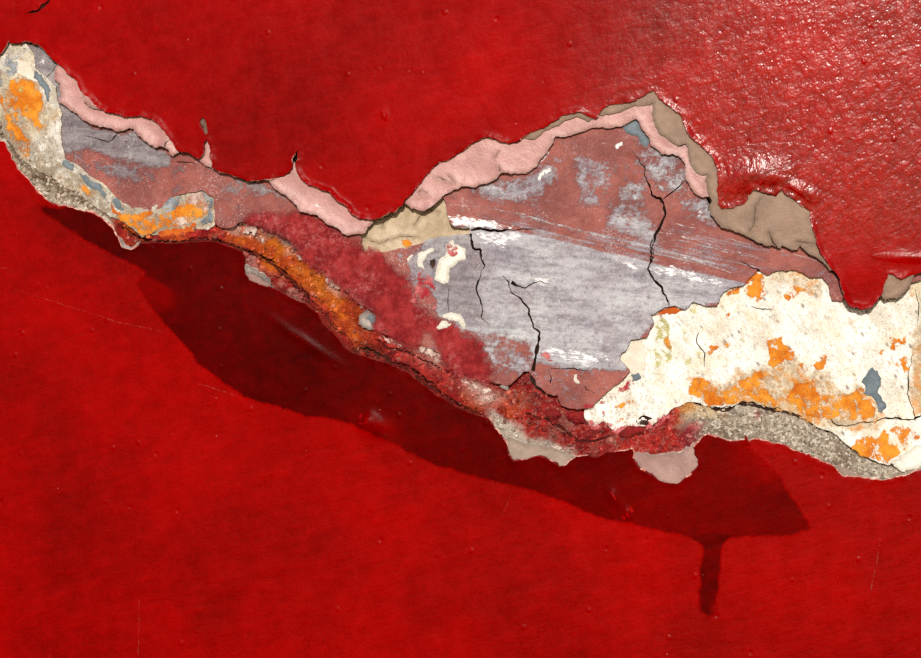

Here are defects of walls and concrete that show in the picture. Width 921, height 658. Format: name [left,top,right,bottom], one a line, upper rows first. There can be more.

crack [30,0,50,13]
peeling [0,42,921,484]
crack [470,227,537,321]
crack [633,152,686,305]
crack [507,280,610,443]